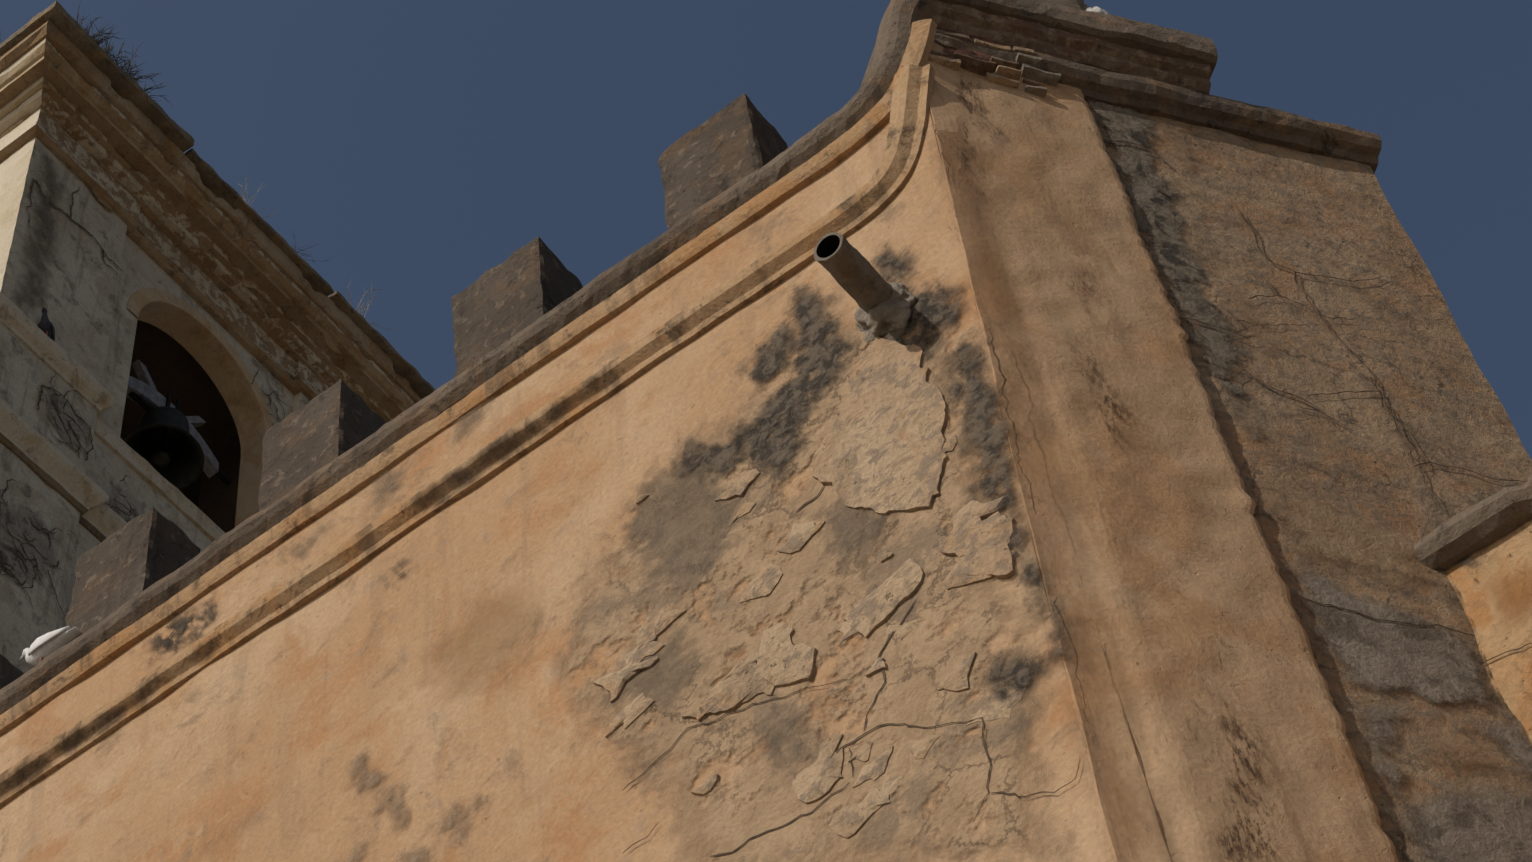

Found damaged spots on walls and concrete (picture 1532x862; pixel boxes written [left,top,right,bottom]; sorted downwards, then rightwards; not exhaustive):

damp [0,680,161,795]
damp [152,599,216,661]
damp [414,376,597,509]
damp [628,286,855,579]
peeling [557,318,1067,862]
damp [800,509,892,614]
crack [622,600,1080,857]
damp [870,246,1070,699]
crack [989,329,1036,514]
crack [1054,597,1091,725]
damp [1221,705,1274,860]
crack [1179,211,1525,512]